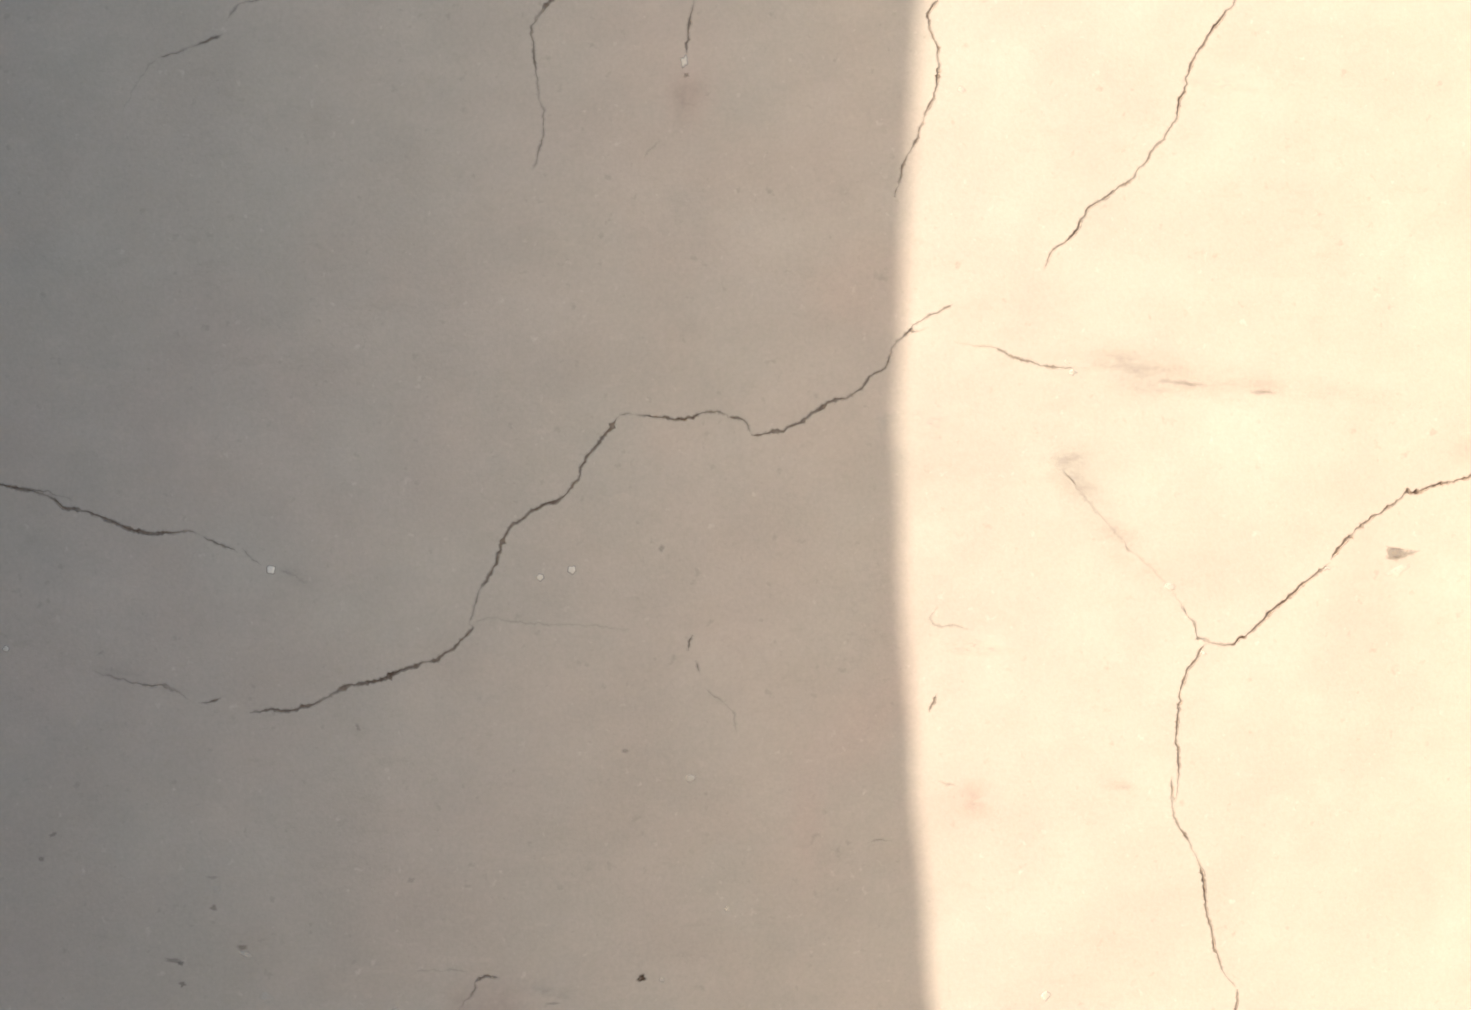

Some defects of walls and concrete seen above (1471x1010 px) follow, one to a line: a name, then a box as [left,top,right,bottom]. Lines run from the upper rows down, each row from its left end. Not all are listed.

crack [530,0,553,67]
crack [900,0,940,179]
crack [1049,10,1226,255]
crack [999,349,1063,368]
crack [482,306,950,585]
spalling [1388,548,1409,559]
crack [263,628,473,712]
crack [1171,475,1471,790]
crack [1180,829,1220,960]